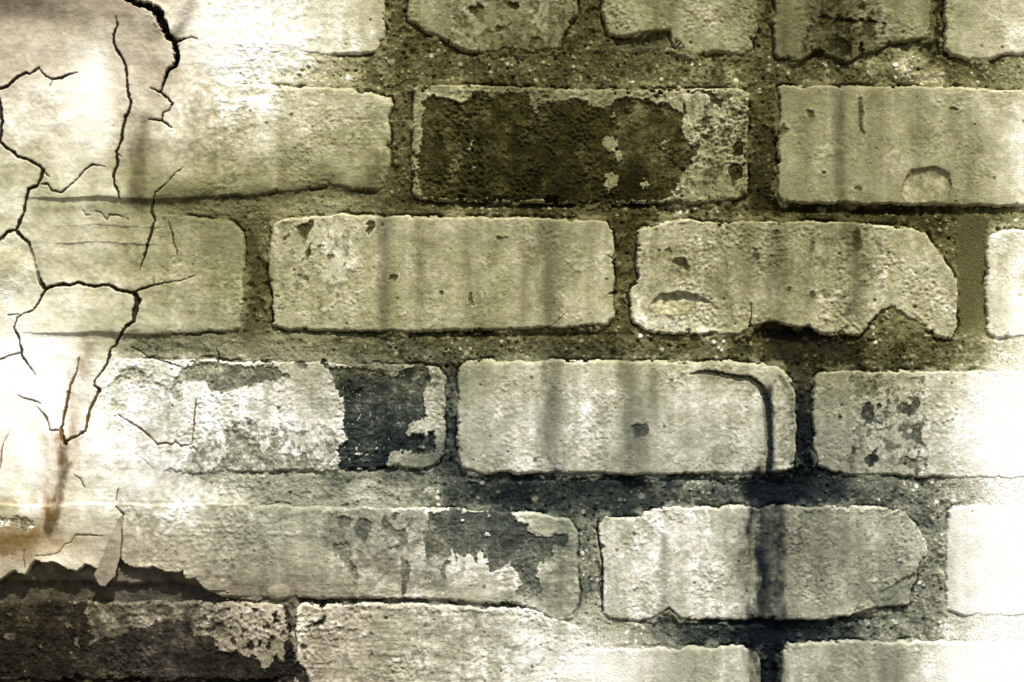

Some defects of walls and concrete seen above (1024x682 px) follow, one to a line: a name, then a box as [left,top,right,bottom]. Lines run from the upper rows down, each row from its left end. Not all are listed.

peeling [417,89,747,205]
crack [0,0,193,446]
crack [120,348,220,464]
peeling [106,358,444,477]
rust [0,438,69,551]
peeling [0,515,326,682]
peeling [333,512,410,595]
peeling [422,506,568,607]
leakage [736,381,808,682]